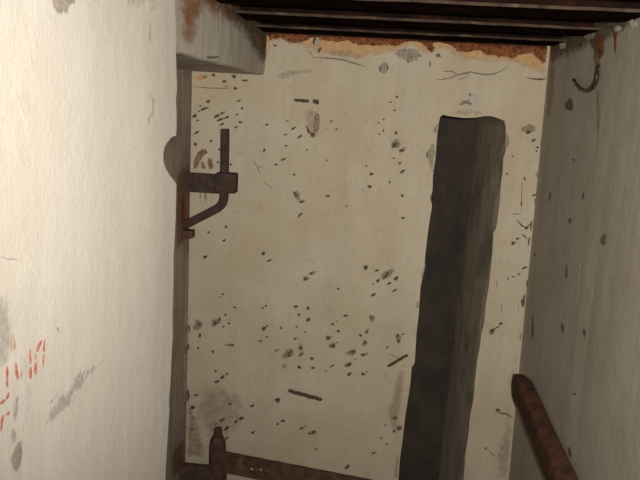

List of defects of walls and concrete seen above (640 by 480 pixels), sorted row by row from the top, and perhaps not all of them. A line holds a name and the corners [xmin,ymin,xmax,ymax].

rust [182,0,556,70]
peeling [395,48,421,63]
crack [436,67,507,80]
spalling [297,113,320,138]
rust [176,150,213,247]
damp [50,368,93,420]